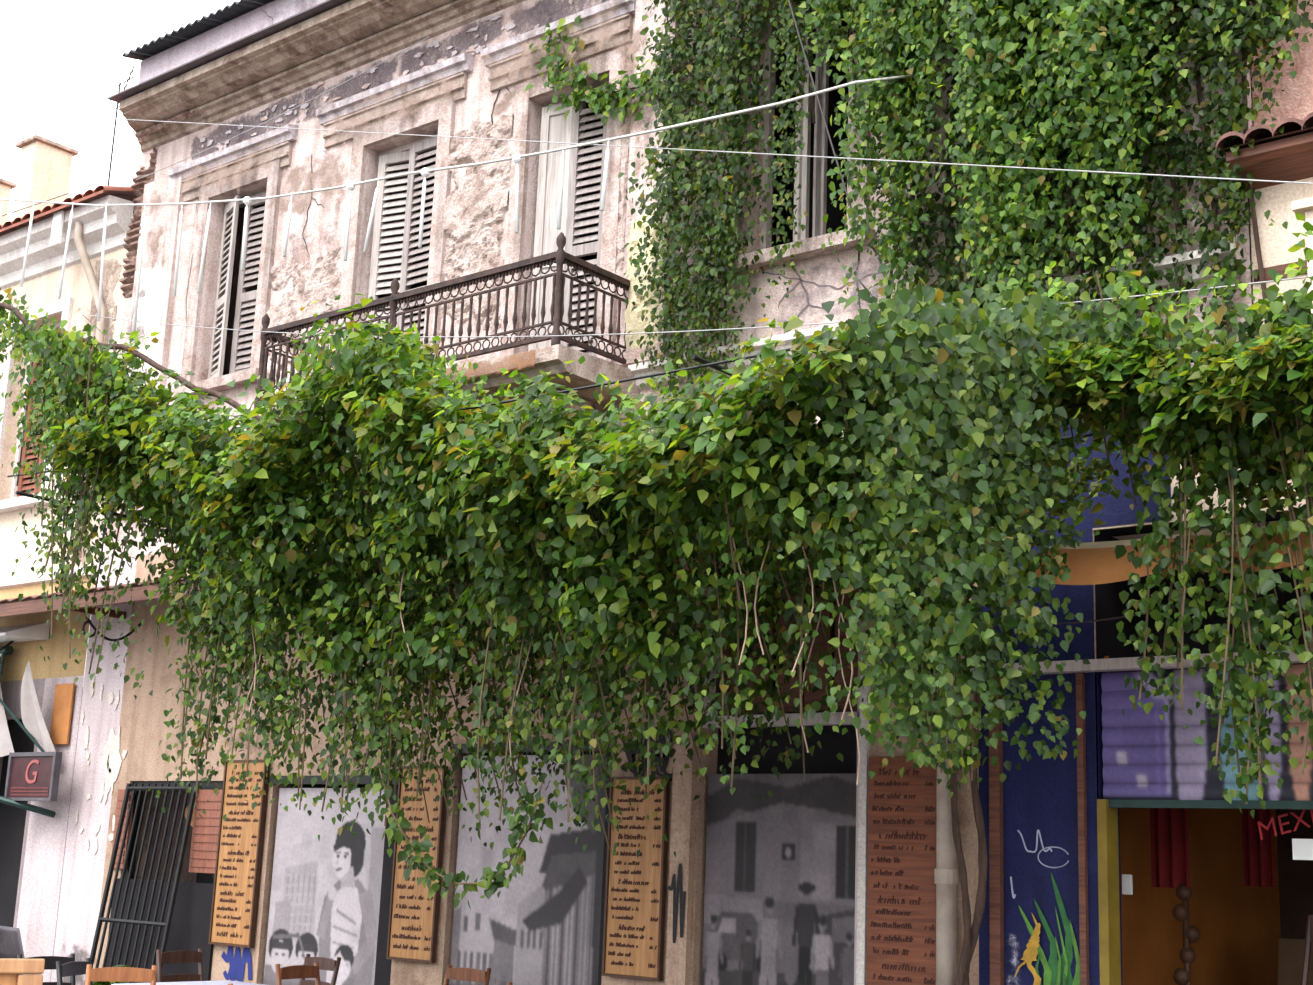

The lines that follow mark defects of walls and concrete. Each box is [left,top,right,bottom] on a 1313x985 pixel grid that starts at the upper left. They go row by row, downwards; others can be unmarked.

peeling [403,15,520,76]
peeling [200,81,341,150]
spalling [266,247,342,380]
spalling [438,112,513,343]
crack [762,245,880,334]
peeling [75,675,127,856]